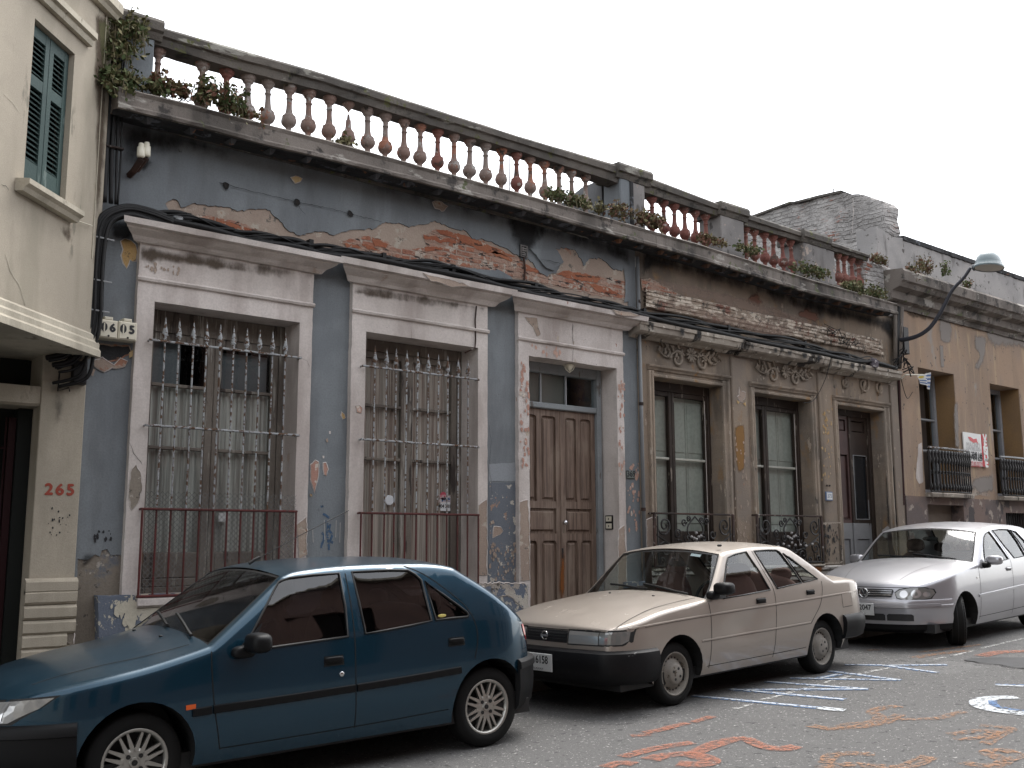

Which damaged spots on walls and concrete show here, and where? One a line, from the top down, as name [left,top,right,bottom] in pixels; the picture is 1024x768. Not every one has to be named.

peeling [120,239,180,276]
flaking render [165,199,819,324]
flaking render [91,343,133,376]
peeling [519,361,530,468]
peeling [310,456,329,496]
peeling [67,530,138,645]
peeling [478,499,530,609]